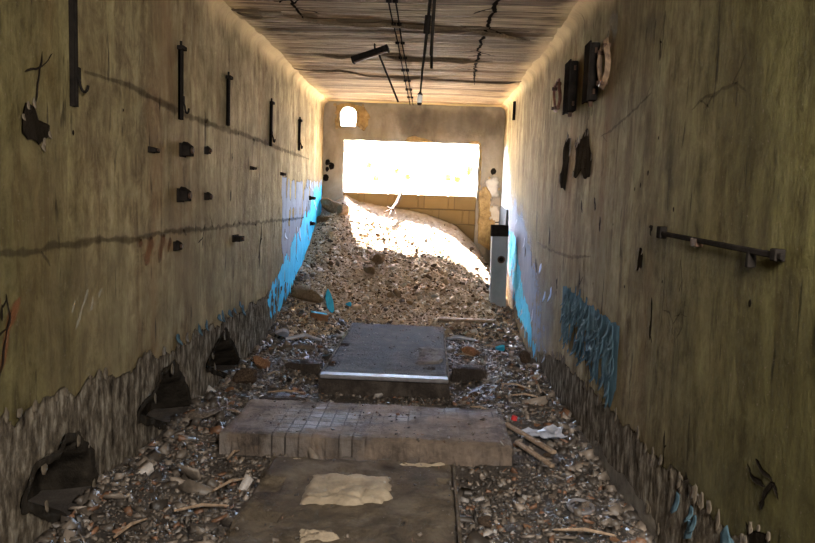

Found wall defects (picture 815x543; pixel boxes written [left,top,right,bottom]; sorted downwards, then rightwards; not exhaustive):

crack [231,0,530,85]
spalling [22,97,52,151]
peeling [559,128,592,190]
crack [0,294,11,376]
spalling [0,159,334,543]